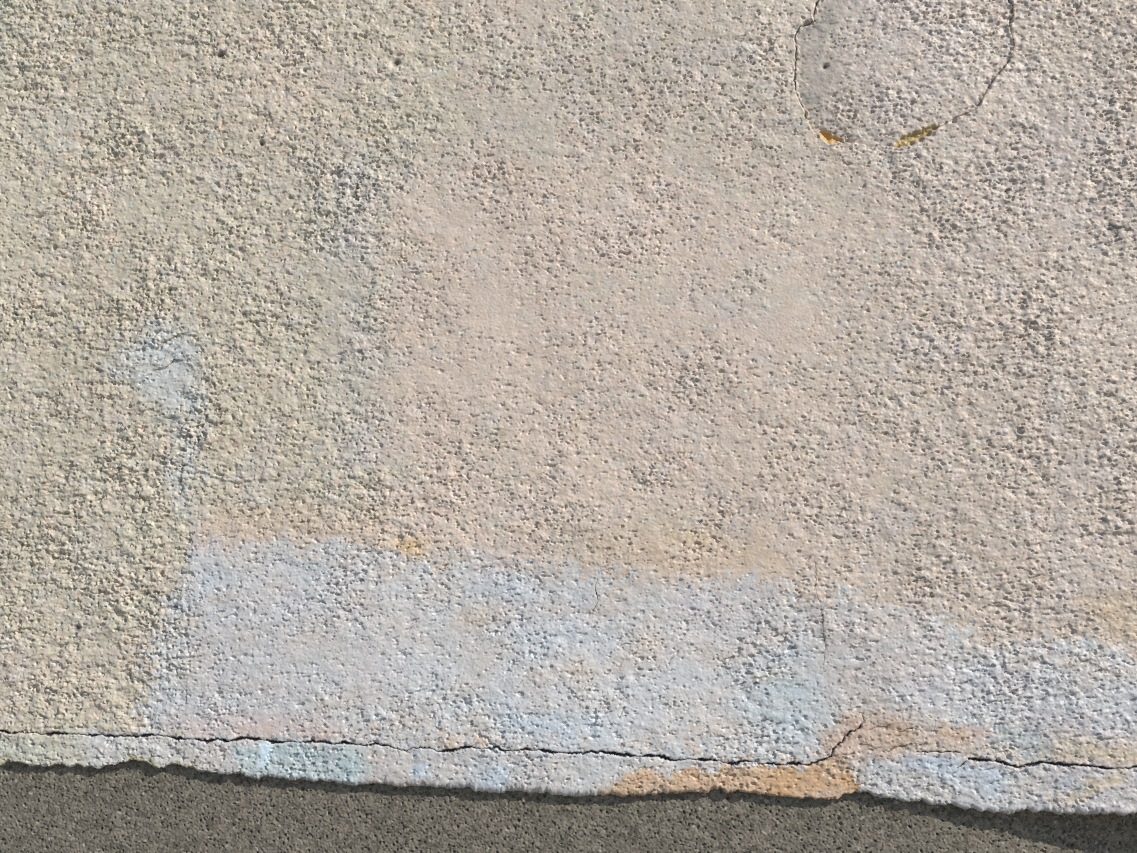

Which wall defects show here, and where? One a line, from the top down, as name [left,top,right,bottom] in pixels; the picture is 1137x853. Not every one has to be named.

crack [793,0,819,121]
crack [942,0,1015,126]
spalling [815,129,846,146]
spalling [892,121,942,152]
leakage [0,305,1137,816]
crack [0,718,1137,770]